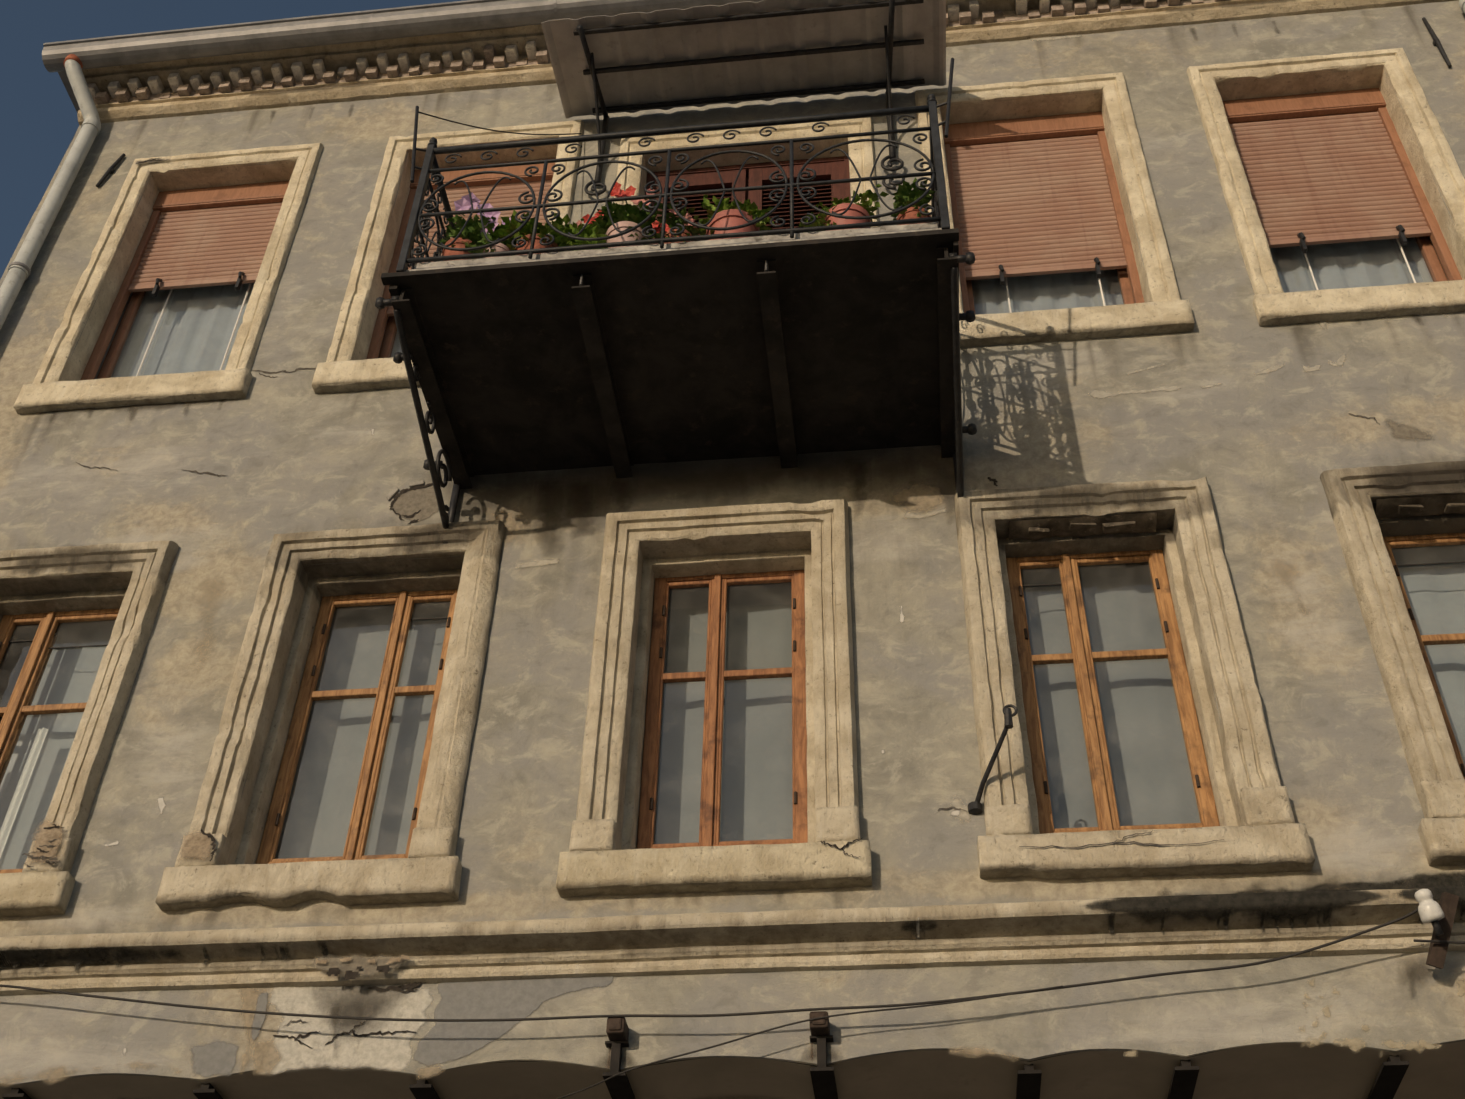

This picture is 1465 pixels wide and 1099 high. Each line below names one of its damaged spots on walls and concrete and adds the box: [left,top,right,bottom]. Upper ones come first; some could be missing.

crack [252,368,316,378]
spalling [22,821,64,867]
spalling [181,829,217,861]
crack [820,838,862,858]
water stain [1086,872,1465,934]
water stain [0,946,180,971]
crack [368,982,426,993]
peeling [242,955,440,1077]
crack [273,1019,416,1049]